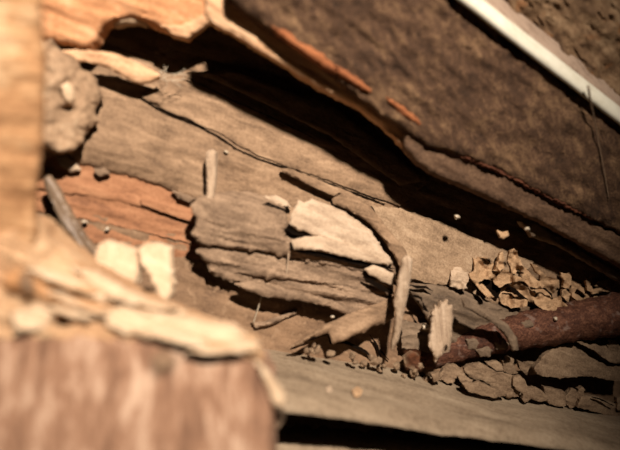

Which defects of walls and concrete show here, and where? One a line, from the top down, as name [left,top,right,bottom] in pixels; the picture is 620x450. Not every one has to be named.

crack [141,99,385,204]
crack [261,202,289,212]
peeling [37,39,620,353]
rust [407,292,620,370]